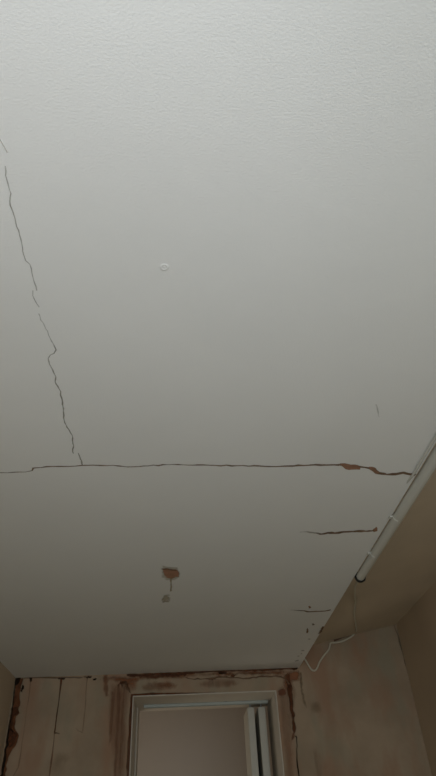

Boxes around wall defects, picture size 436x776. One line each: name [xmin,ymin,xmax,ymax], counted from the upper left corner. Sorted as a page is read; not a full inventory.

crack [0,346,416,476]
peeling [162,568,179,591]
crack [315,527,377,535]
flaking render [0,678,24,776]